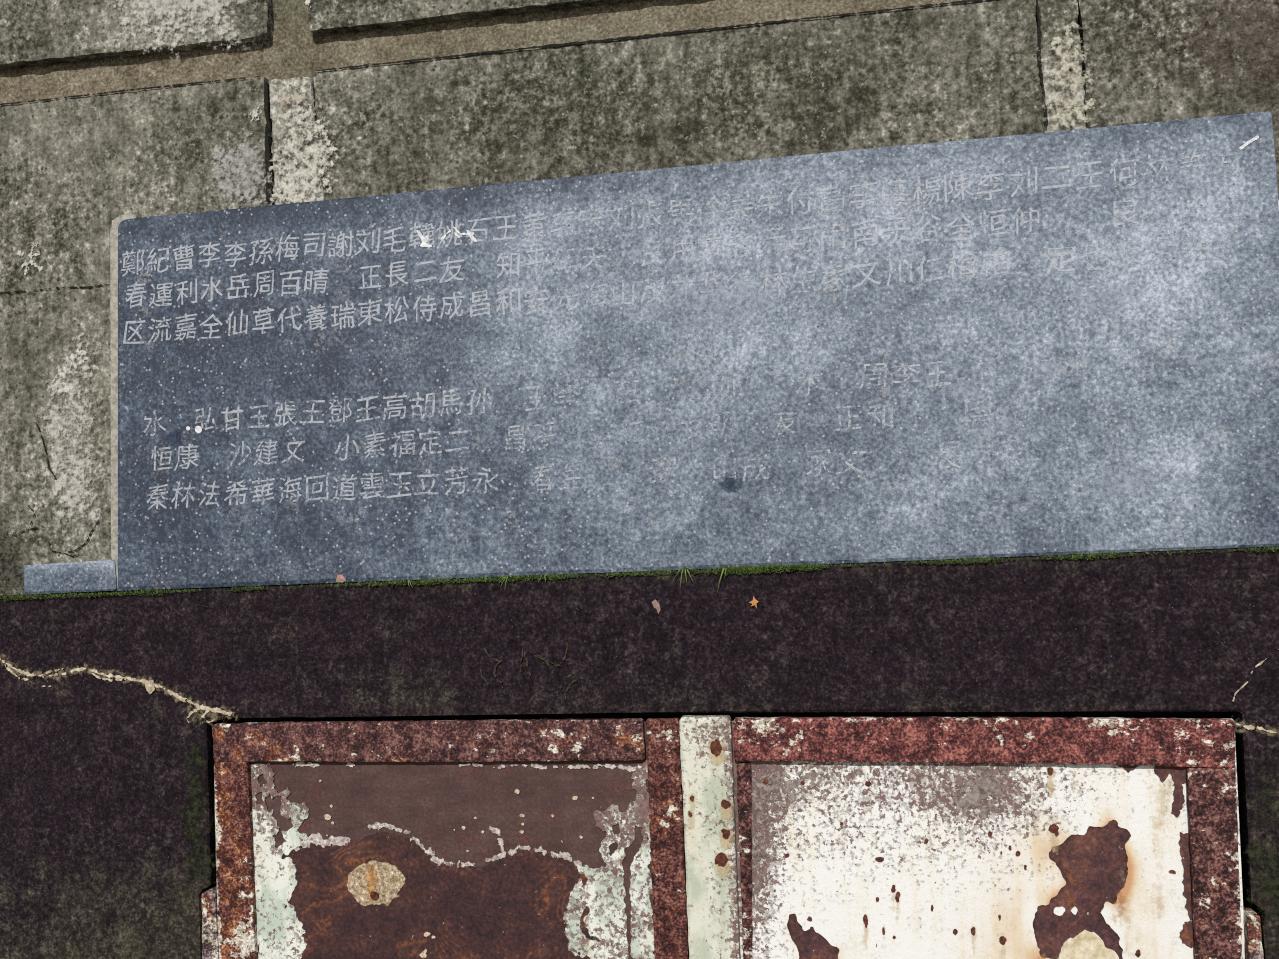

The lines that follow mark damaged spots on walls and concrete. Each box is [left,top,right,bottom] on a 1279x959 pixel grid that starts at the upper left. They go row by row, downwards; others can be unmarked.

crack [0,654,237,724]
crack [1232,657,1279,737]
peeling [251,761,309,959]
rust [282,831,593,959]
peeling [563,760,655,959]
rust [787,914,839,959]
peeling [747,761,1017,916]
rust [1033,820,1141,959]